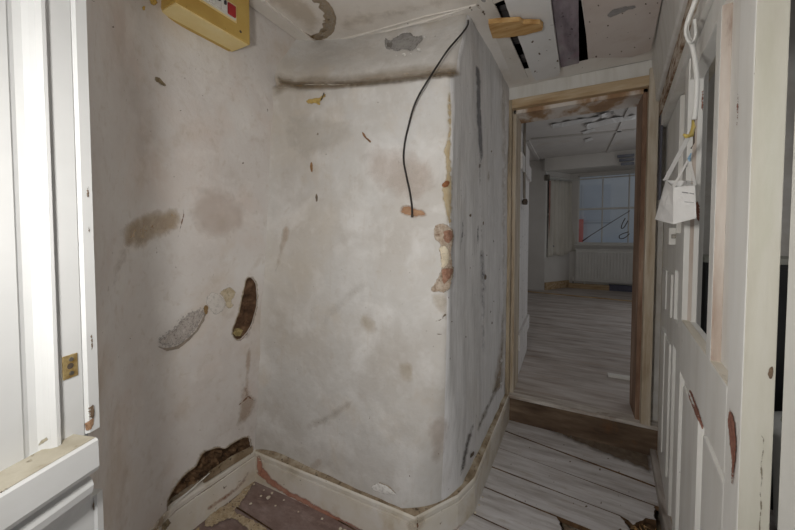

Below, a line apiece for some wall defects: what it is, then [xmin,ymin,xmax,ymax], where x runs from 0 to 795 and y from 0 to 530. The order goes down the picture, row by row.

damp [306,0,336,40]
flaking render [385,33,426,57]
spalling [431,99,454,293]
spalling [220,277,258,340]
peeling [688,390,703,429]
peeling [728,411,737,482]
spalling [162,436,253,530]